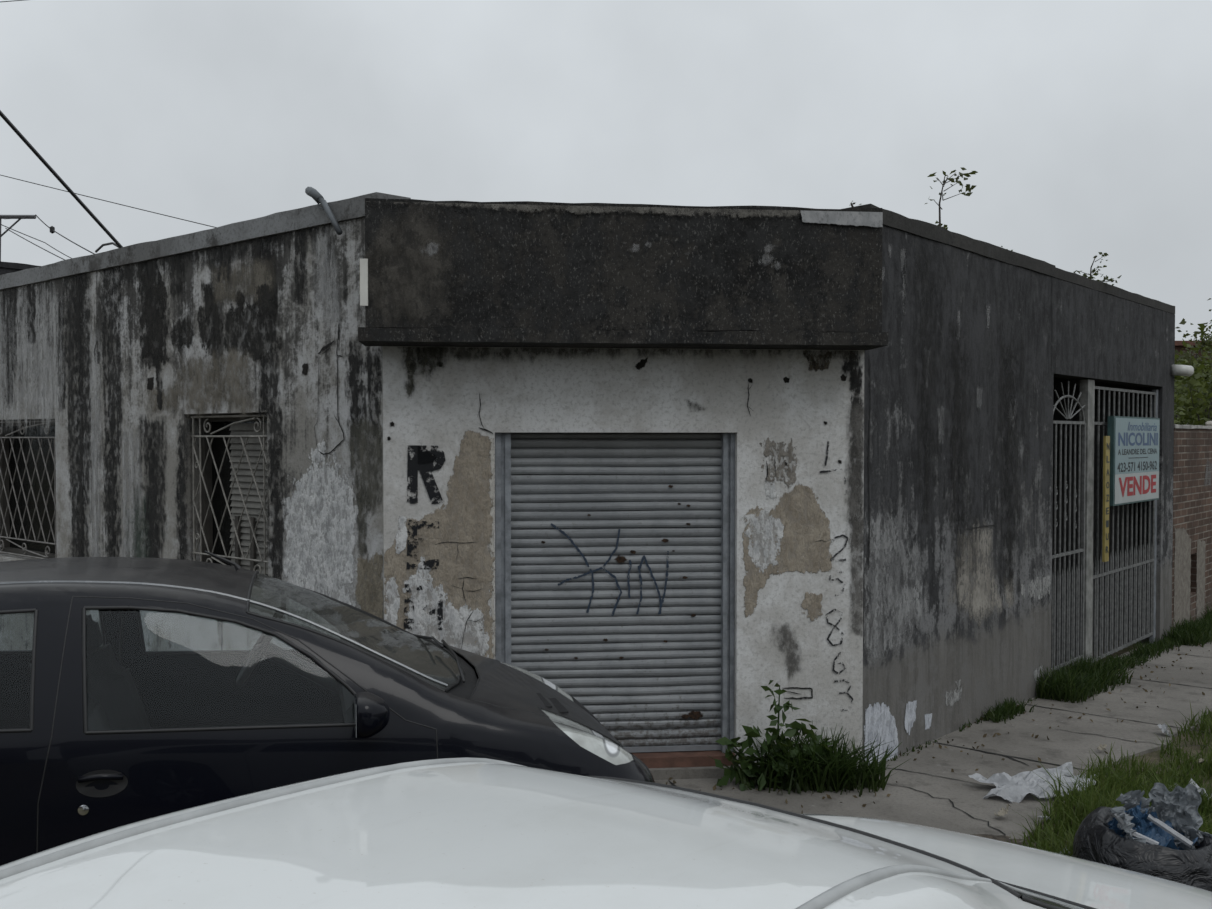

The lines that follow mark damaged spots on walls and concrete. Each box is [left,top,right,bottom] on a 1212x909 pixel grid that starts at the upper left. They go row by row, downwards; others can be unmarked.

water stain [2,284,36,403]
water stain [57,224,330,580]
water stain [345,338,382,555]
peeling [280,431,496,659]
peeling [742,437,832,621]